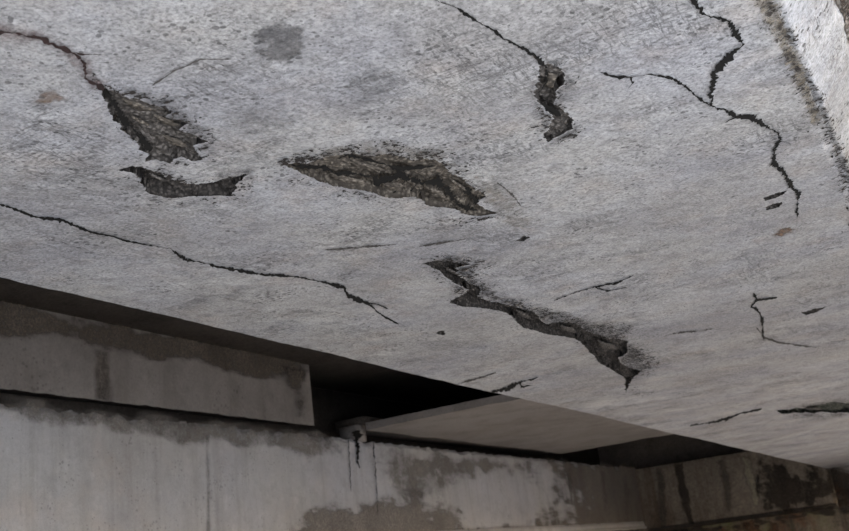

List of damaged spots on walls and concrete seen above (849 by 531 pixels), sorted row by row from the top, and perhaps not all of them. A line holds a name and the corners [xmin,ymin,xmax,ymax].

crack [437,0,548,68]
spalling [85,73,256,206]
crack [601,0,801,217]
spalling [267,140,516,227]
crack [0,204,398,324]
damp [0,301,306,409]
spalling [424,252,662,396]
crack [750,293,811,347]
damp [13,400,334,455]
damp [299,453,531,531]
damp [536,459,651,531]
damp [740,457,849,511]